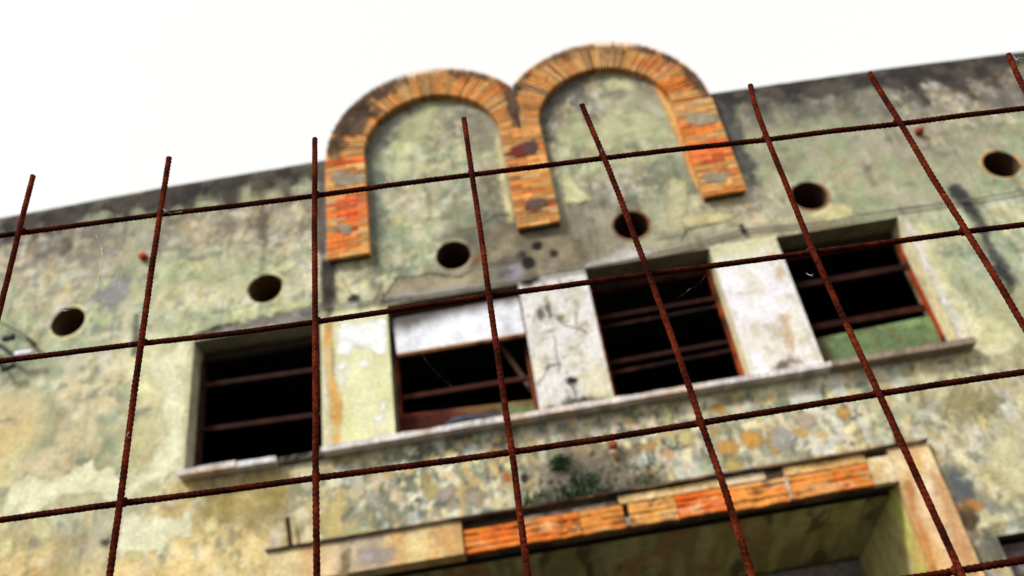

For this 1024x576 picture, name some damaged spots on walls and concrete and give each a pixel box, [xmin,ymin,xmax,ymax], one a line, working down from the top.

peeling [390,102,442,163]
damp [630,46,1024,192]
spalling [1005,52,1024,94]
damp [945,180,1021,295]
damp [128,313,144,358]
rust [322,323,344,446]
spalling [0,112,733,576]
crack [539,311,587,382]
spalling [475,71,1024,576]
damp [514,421,676,519]